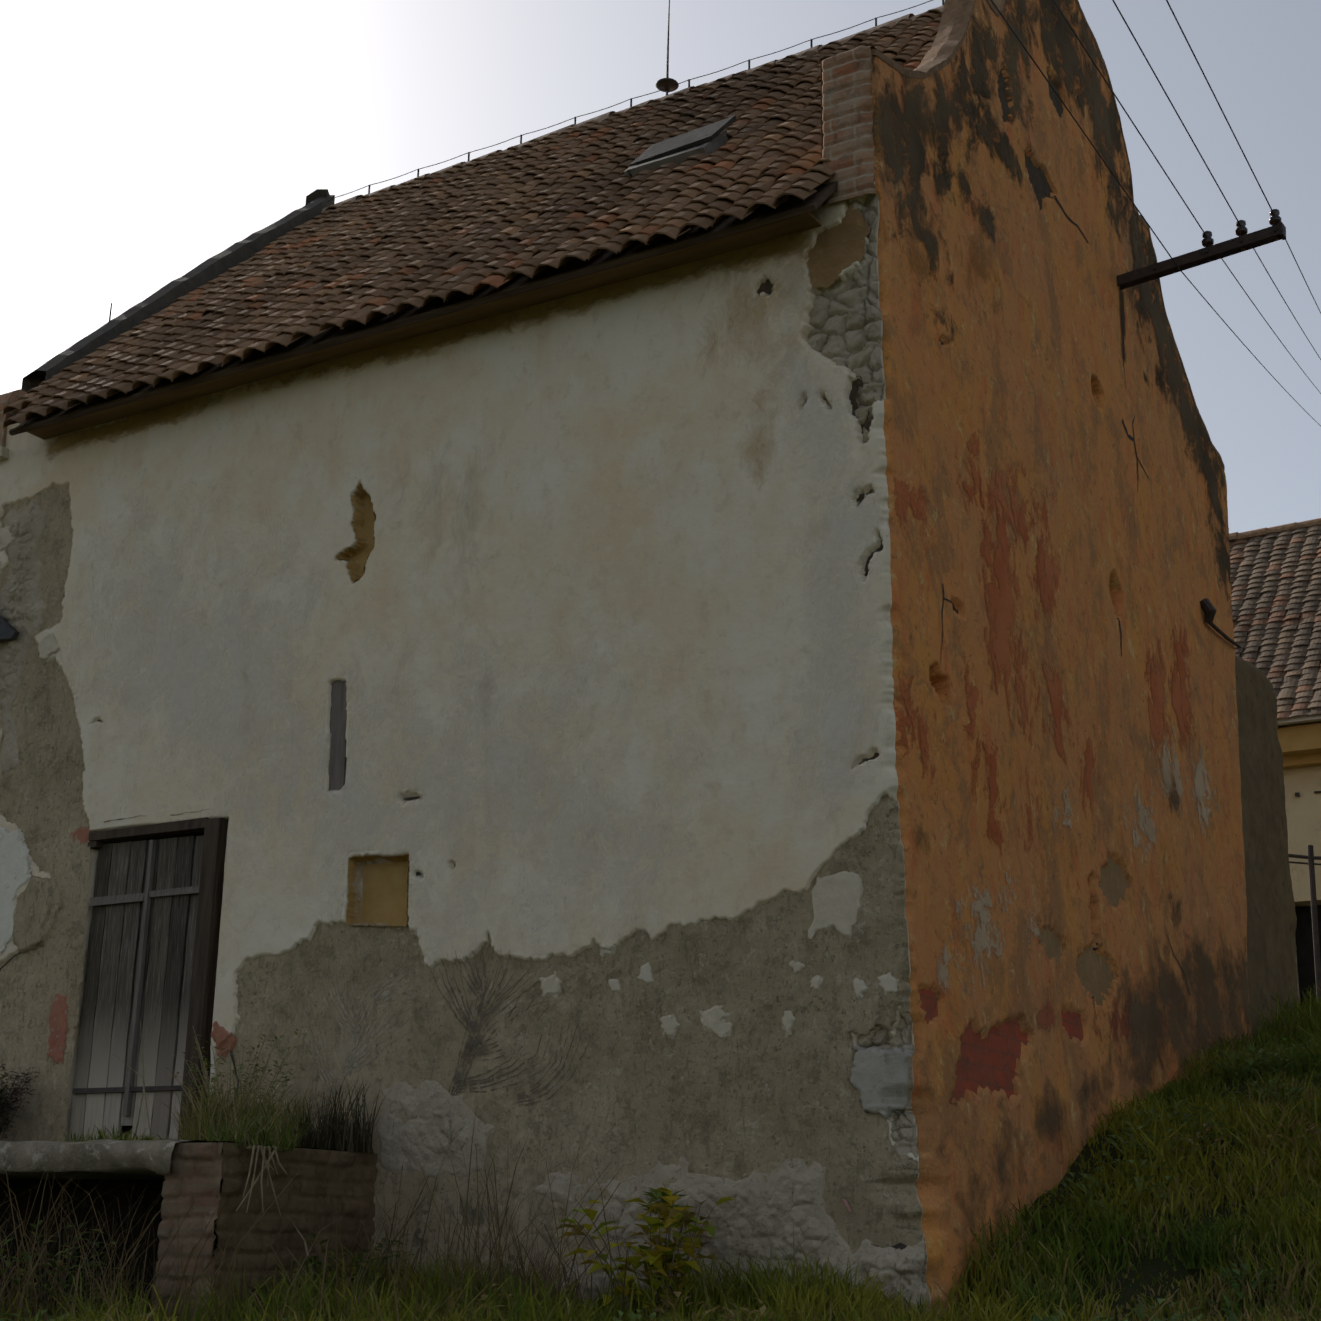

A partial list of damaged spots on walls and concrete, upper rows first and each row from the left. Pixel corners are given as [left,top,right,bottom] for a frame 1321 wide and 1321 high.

damp [944,160,997,243]
damp [977,83,1023,183]
spalling [805,194,885,443]
crack [1122,416,1149,492]
spalling [336,483,376,582]
spalling [864,534,883,577]
spalling [0,483,92,1142]
peeling [1117,726,1219,863]
spalling [211,794,1018,1318]
flaking render [949,945,1133,1105]
damp [1119,940,1251,1097]